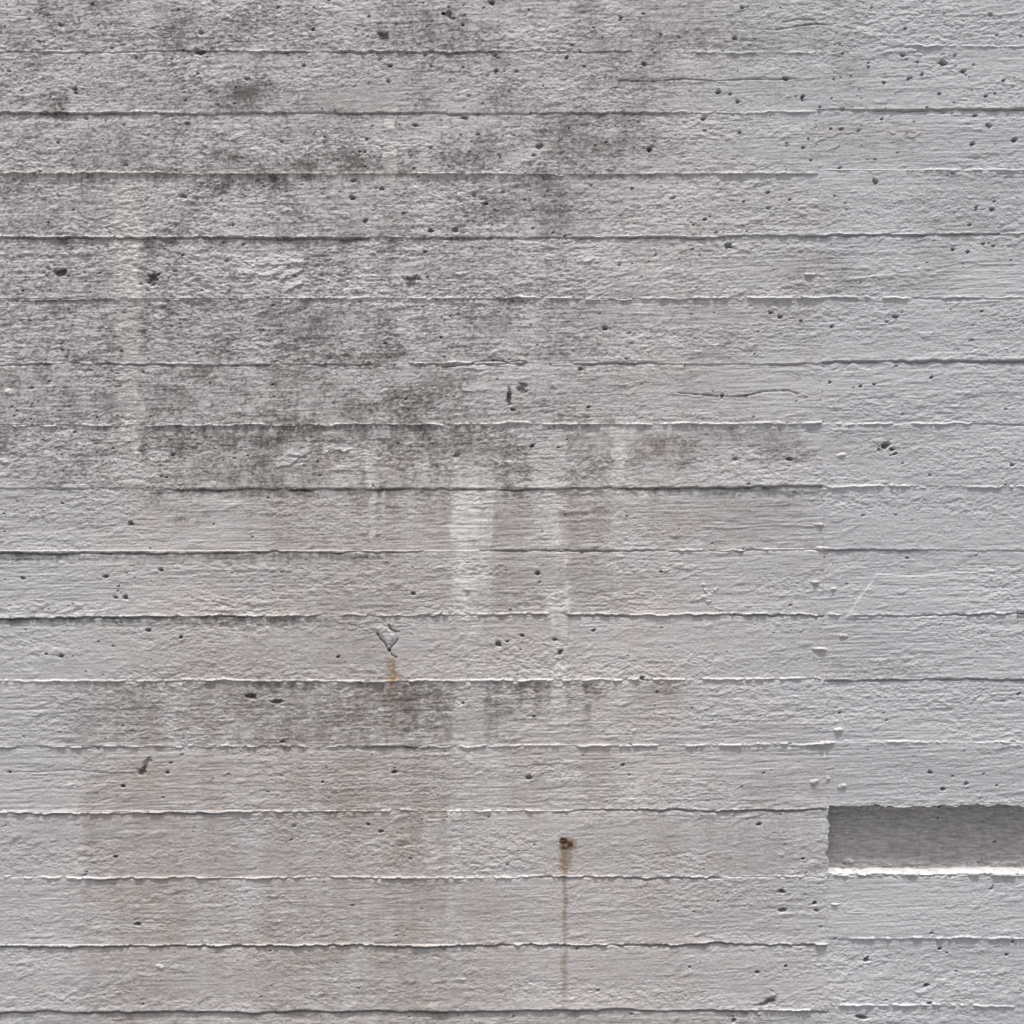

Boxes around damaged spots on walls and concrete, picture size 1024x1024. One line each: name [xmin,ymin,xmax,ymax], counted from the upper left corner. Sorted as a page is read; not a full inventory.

water stain [382,106,397,186]
water stain [348,452,389,599]
rust [560,837,575,866]